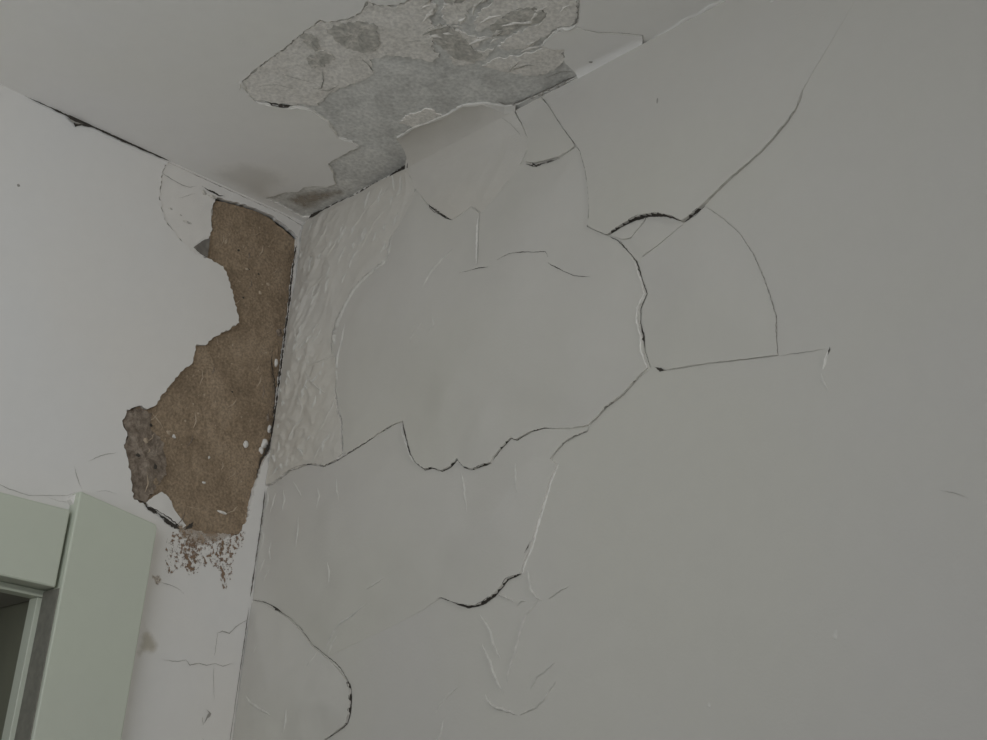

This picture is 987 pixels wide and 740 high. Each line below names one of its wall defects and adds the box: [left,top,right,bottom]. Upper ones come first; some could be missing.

crack [30,98,171,162]
crack [169,246,352,738]
crack [443,574,521,608]
peeling [122,0,855,656]
crack [286,101,822,475]